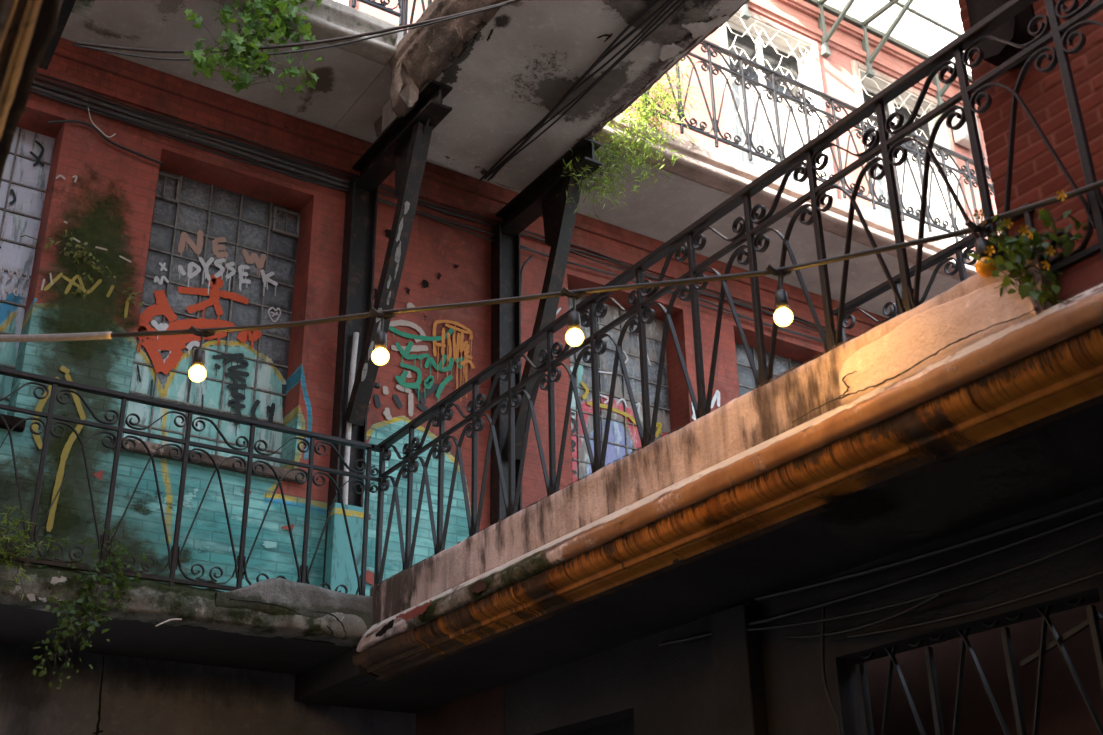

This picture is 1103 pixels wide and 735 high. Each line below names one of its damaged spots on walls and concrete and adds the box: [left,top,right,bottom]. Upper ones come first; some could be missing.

leakage [440,0,518,84]
leakage [516,0,721,140]
crack [792,310,1038,423]
leakage [362,283,1103,637]
crack [92,655,104,735]